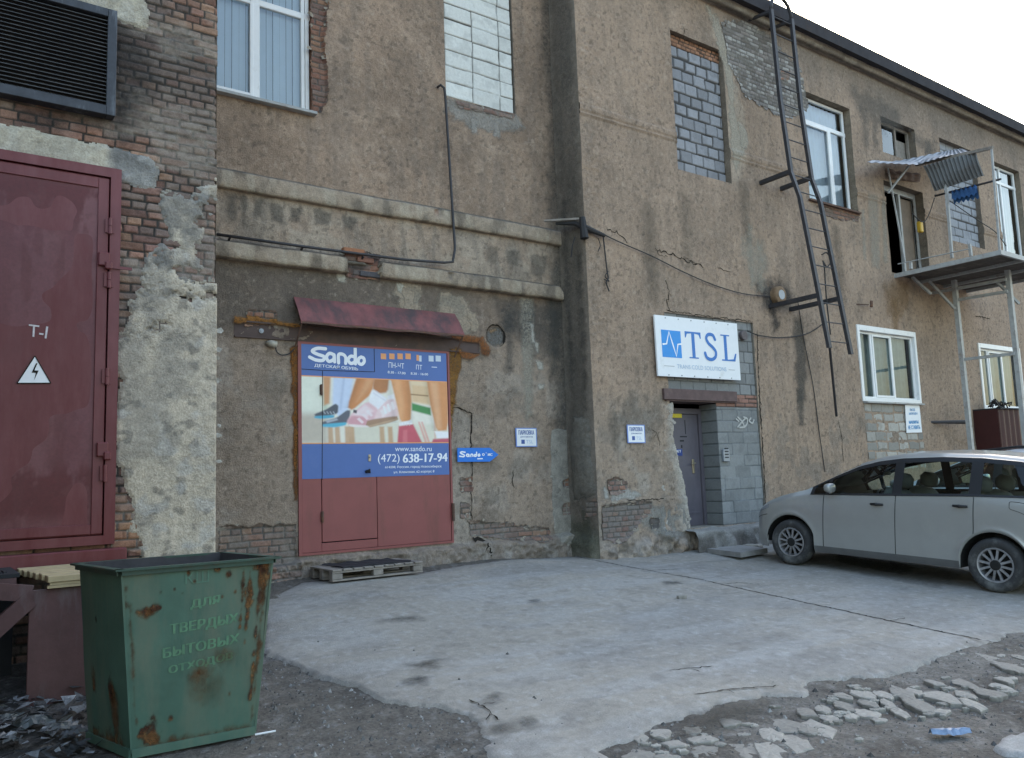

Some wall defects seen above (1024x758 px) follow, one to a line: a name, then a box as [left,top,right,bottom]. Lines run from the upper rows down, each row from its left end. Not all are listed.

flaking render [706,5,809,170]
flaking render [0,123,302,583]
water stain [794,321,805,425]
flaking render [459,476,553,543]
flaking render [585,402,691,544]